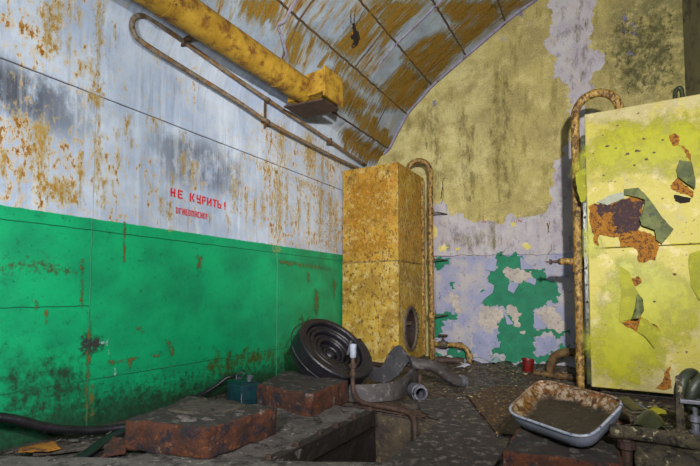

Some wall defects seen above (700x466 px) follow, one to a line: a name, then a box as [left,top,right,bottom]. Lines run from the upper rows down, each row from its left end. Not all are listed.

corrosion [40,1,79,58]
corrosion [78,4,104,126]
corrosion [239,0,283,29]
corrosion [283,0,532,165]
leakage [616,15,674,92]
corrosion [30,121,83,204]
peeling [426,0,605,368]
corrosion [84,328,95,422]